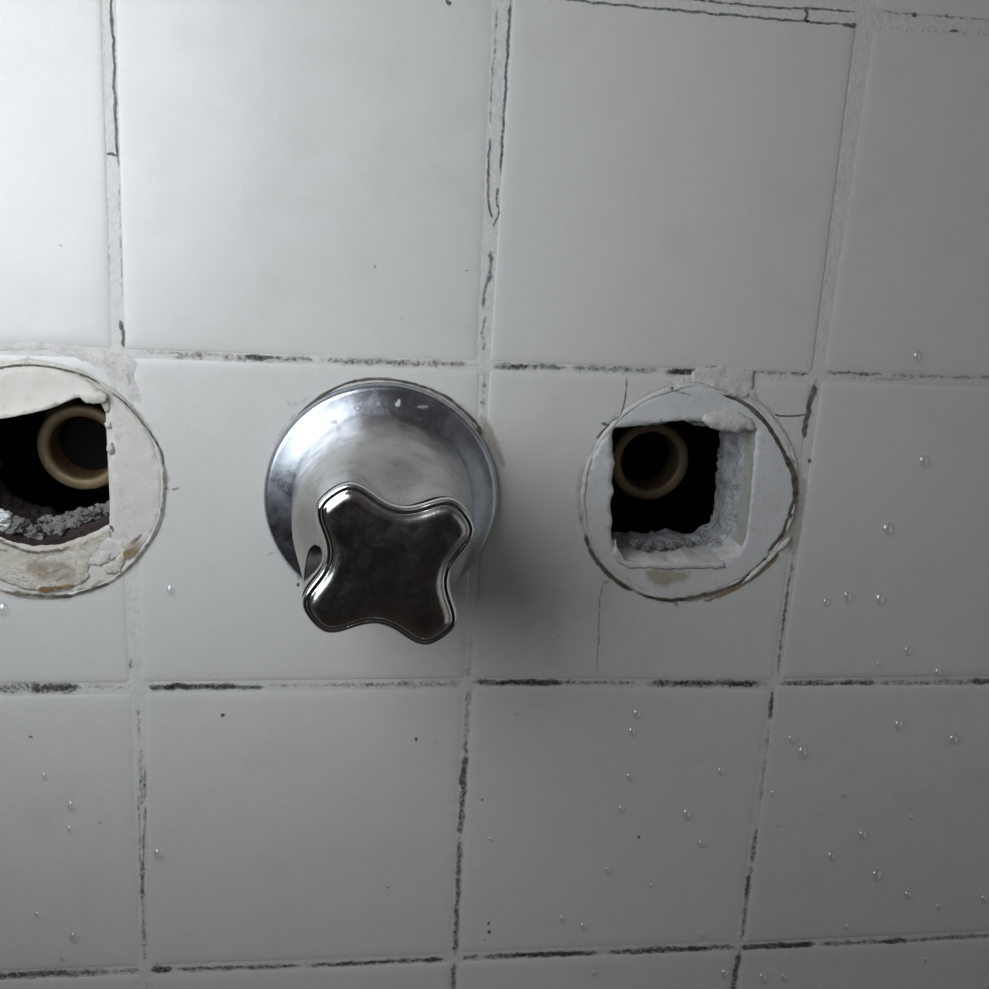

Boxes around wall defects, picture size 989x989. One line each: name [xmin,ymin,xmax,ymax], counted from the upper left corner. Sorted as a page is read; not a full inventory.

flaking render [0,366,161,594]
flaking render [586,366,797,597]
damp [0,684,77,693]